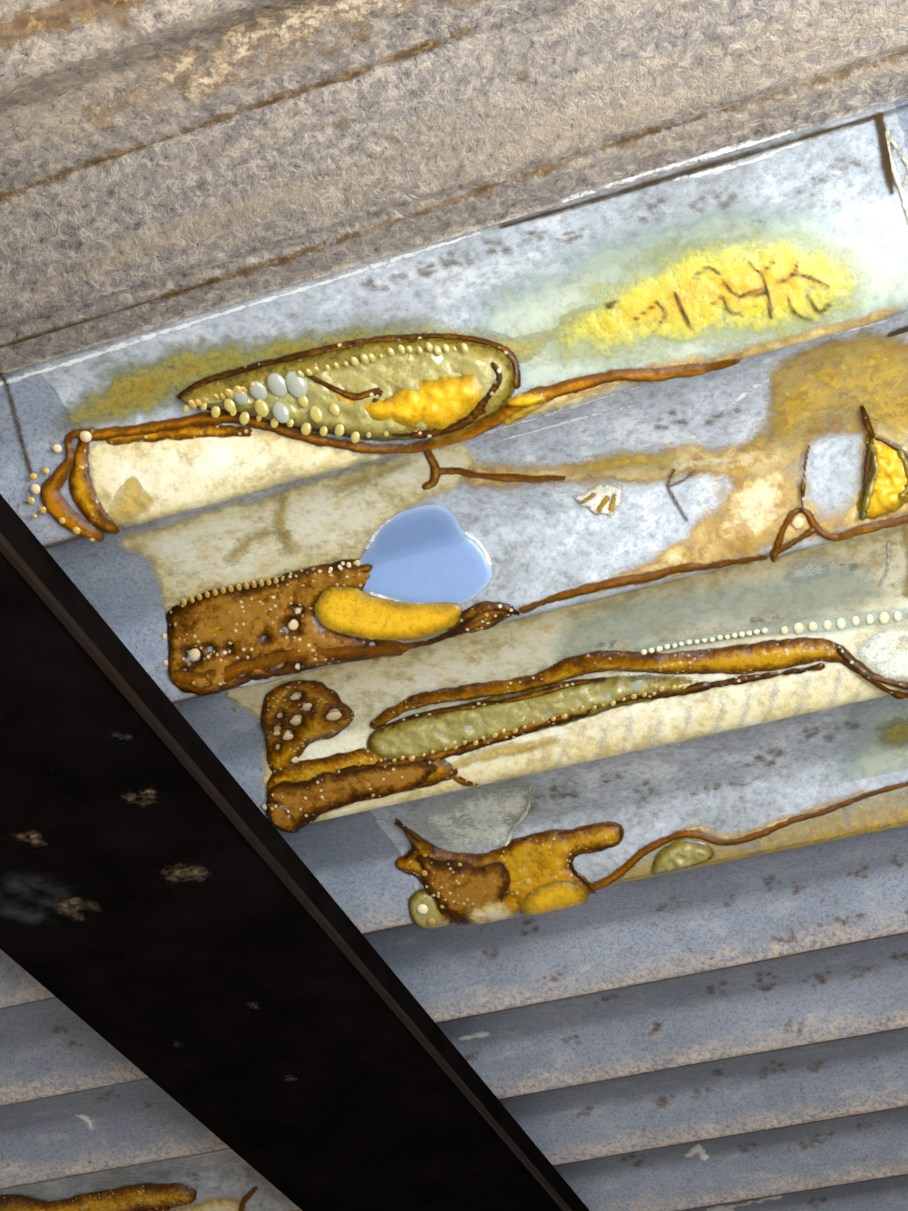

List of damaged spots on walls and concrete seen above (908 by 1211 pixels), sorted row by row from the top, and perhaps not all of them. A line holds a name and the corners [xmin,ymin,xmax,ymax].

corrosion [0,0,148,50]
water stain [27,214,908,929]
water stain [0,1183,258,1211]